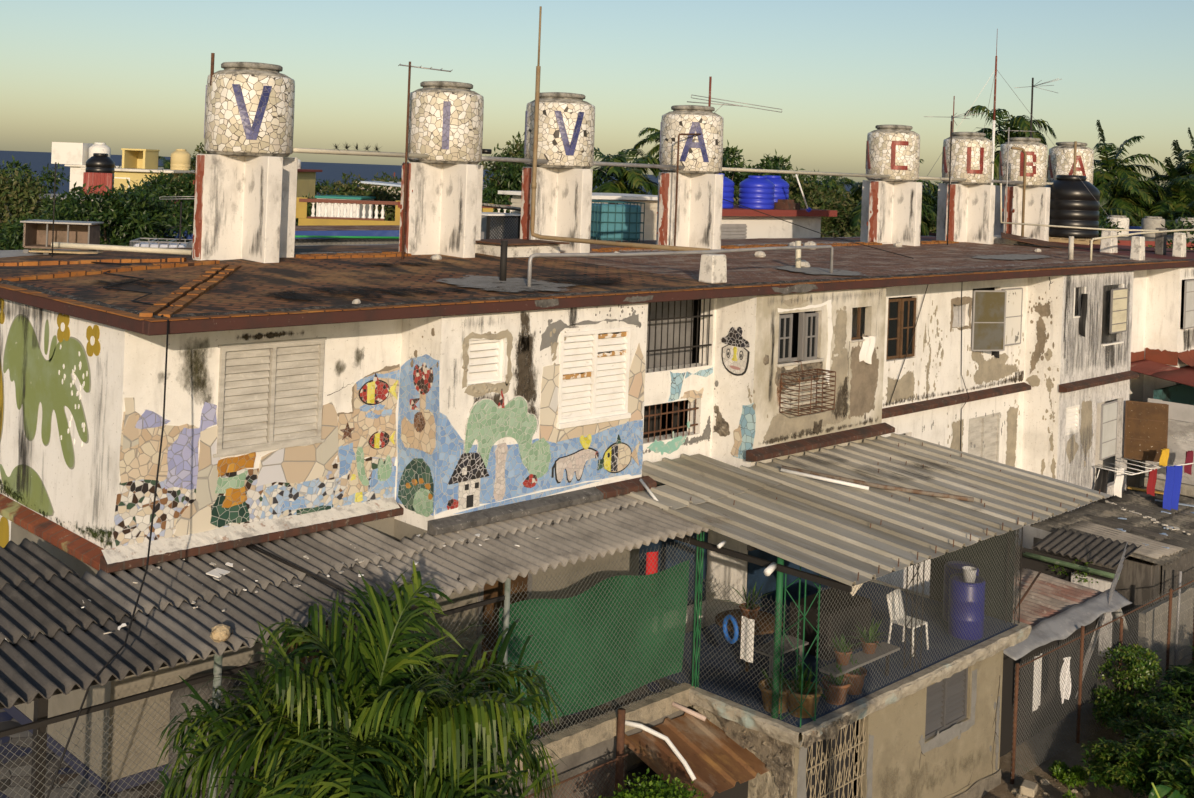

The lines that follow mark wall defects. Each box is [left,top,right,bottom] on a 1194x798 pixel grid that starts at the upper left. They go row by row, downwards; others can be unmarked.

spalling [772,283,818,307]
damp [184,340,210,402]
damp [474,311,537,414]
peeling [747,296,972,442]
peeling [938,399,1020,467]
peeling [958,291,1094,478]